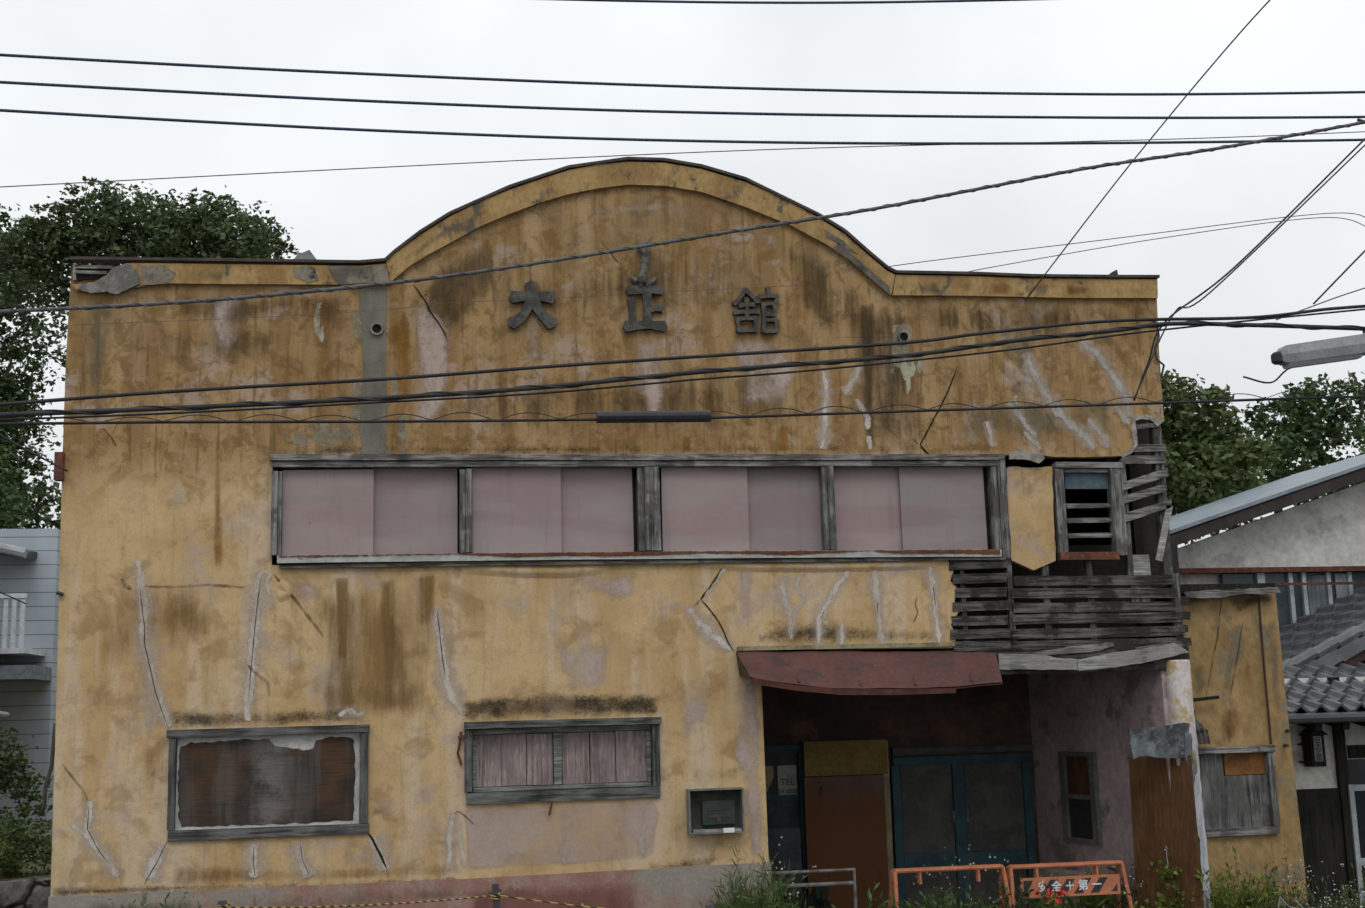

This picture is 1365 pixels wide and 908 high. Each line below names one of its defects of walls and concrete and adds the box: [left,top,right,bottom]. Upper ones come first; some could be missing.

spalling [73,263,175,295]
crack [413,284,448,341]
damp [853,308,903,436]
peeling [892,325,924,393]
crack [915,369,957,454]
damp [420,577,433,621]
crack [686,569,734,651]
damp [276,580,409,724]
damp [171,714,229,724]
damp [466,698,550,717]
damp [569,696,656,713]